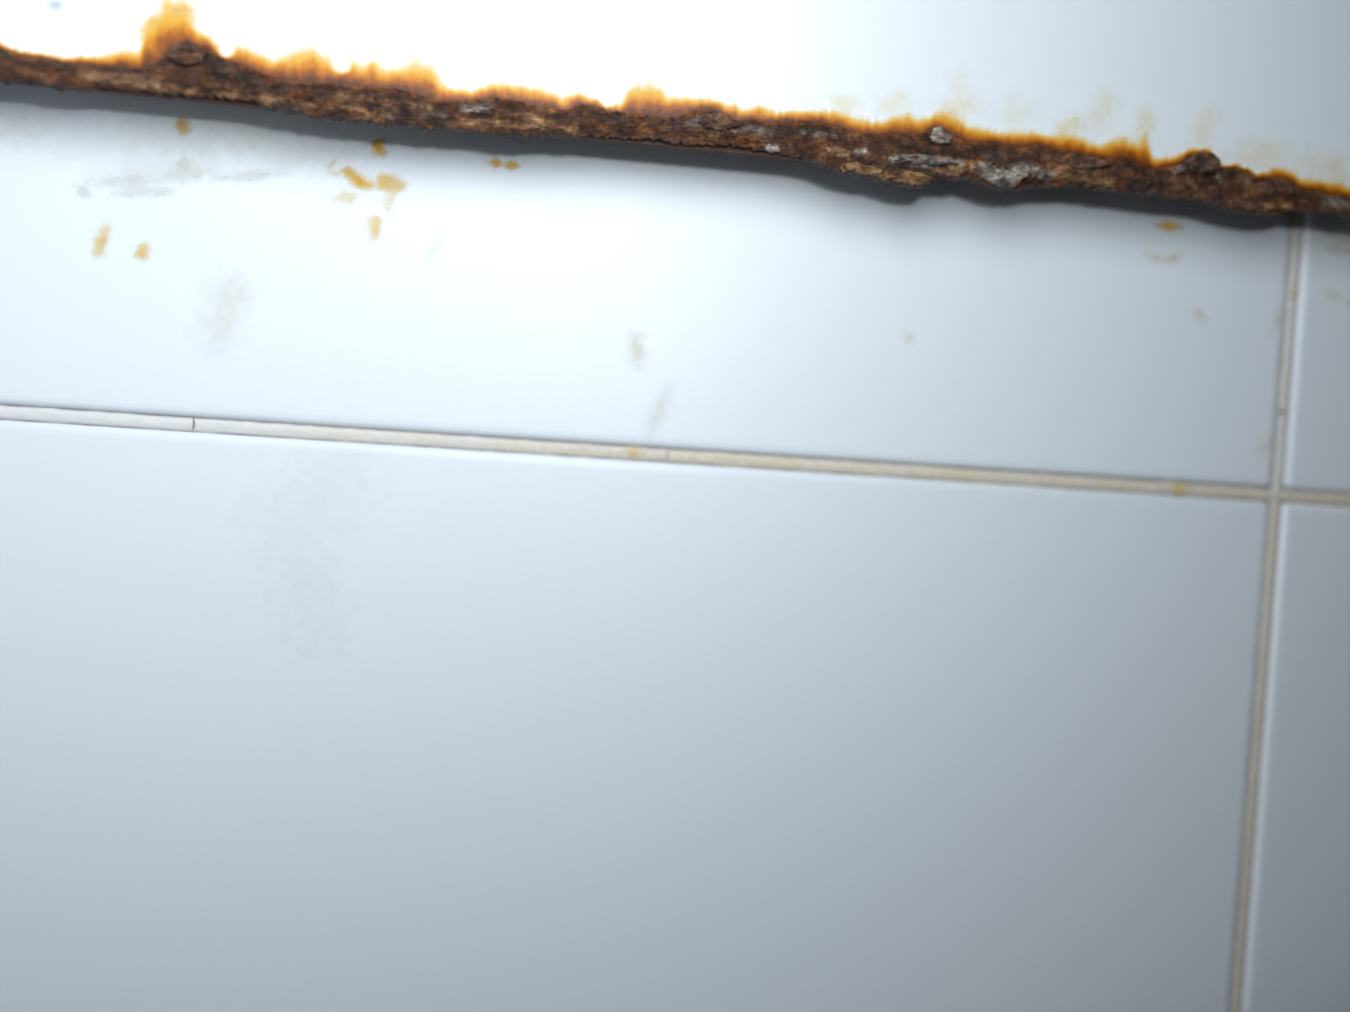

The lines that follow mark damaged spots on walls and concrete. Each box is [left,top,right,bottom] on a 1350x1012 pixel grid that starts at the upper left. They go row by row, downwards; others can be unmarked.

rust [0,0,1350,219]
rust [371,217,380,237]
rust [94,229,106,253]